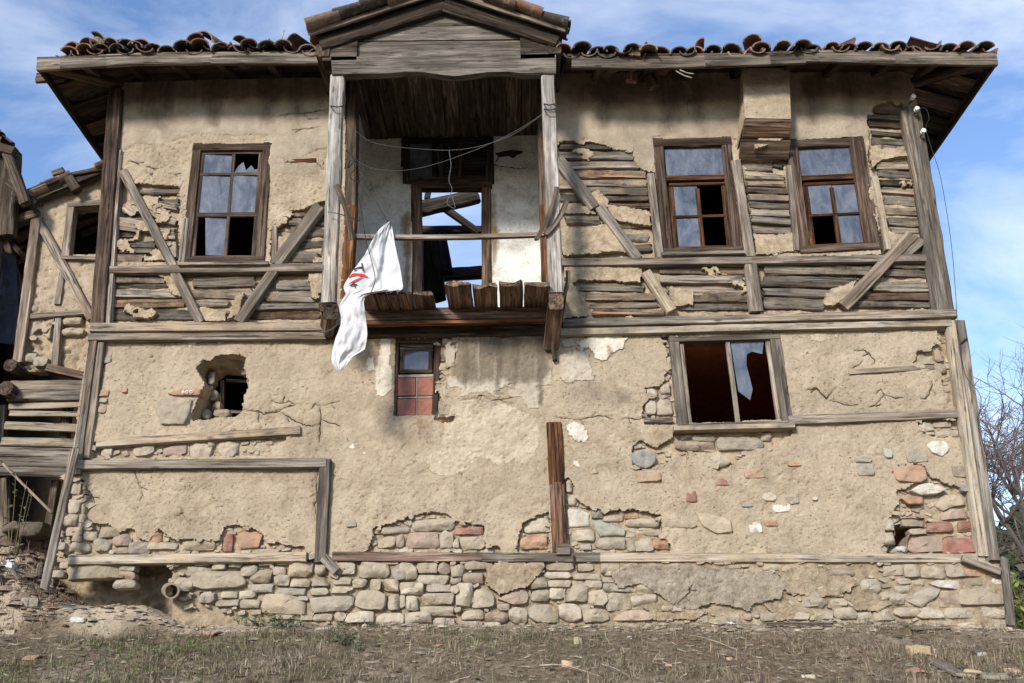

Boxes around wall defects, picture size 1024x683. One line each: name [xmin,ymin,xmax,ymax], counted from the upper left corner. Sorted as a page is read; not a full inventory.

spalling [864,100,919,247]
spalling [116,179,185,264]
spalling [113,207,325,322]
spalling [558,140,871,319]
spalling [852,264,930,309]
crack [249,395,339,438]
peeling [425,336,628,477]
crack [807,382,933,407]
spalling [56,474,305,558]
spalling [363,514,494,553]
peeling [565,478,786,611]
spalling [873,478,976,554]